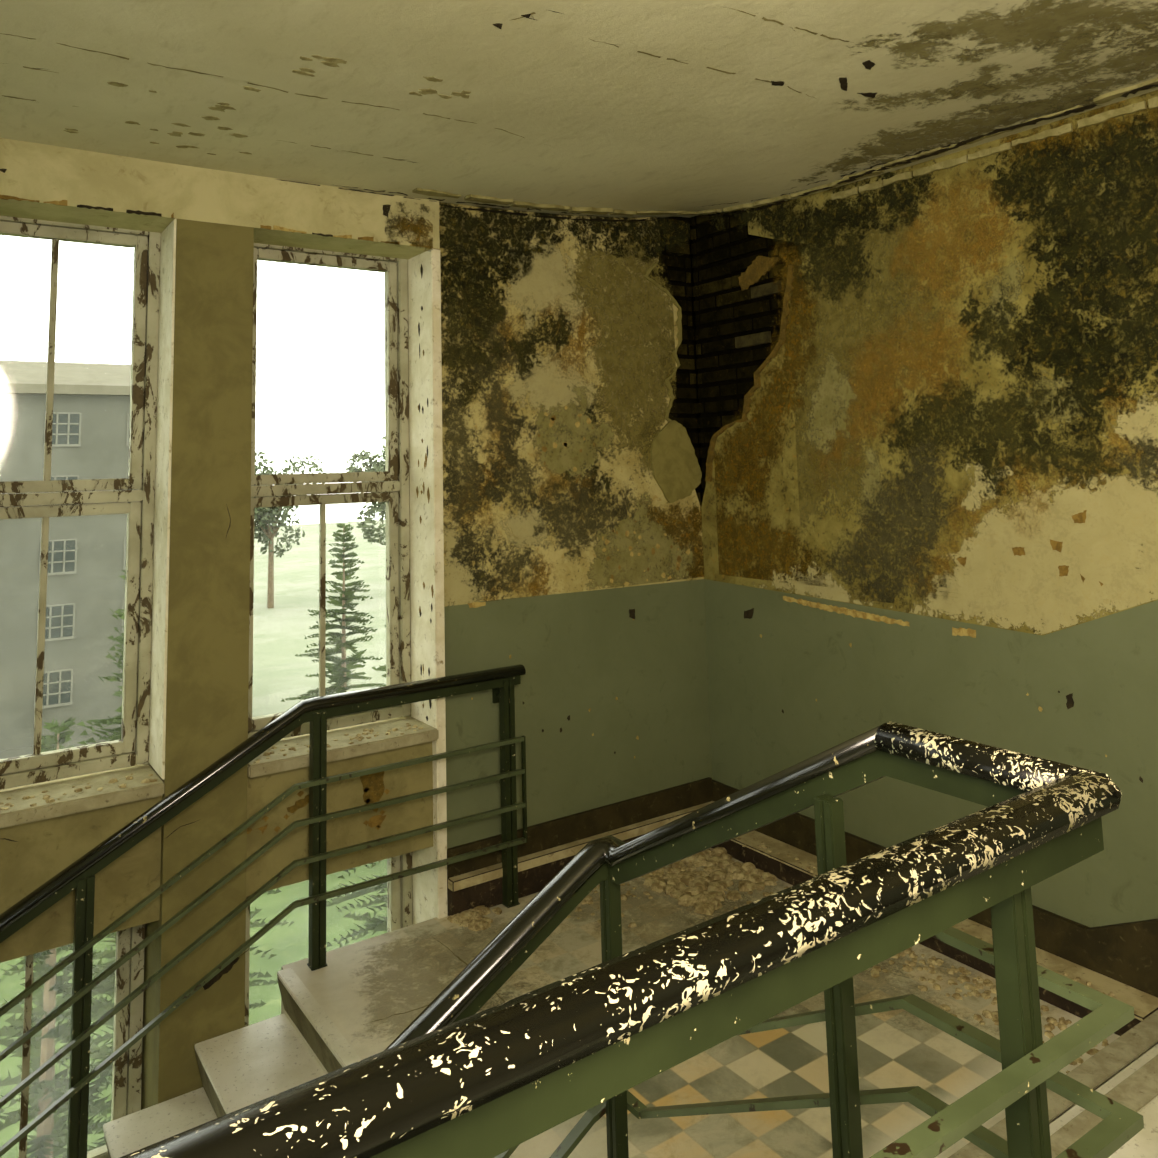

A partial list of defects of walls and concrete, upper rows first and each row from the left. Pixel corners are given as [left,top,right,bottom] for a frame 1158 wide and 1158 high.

peeling [125,103,248,155]
peeling [292,55,347,77]
water stain [711,0,1158,301]
flaking render [409,77,1158,590]
water stain [825,115,1158,605]
peeling [419,518,495,623]